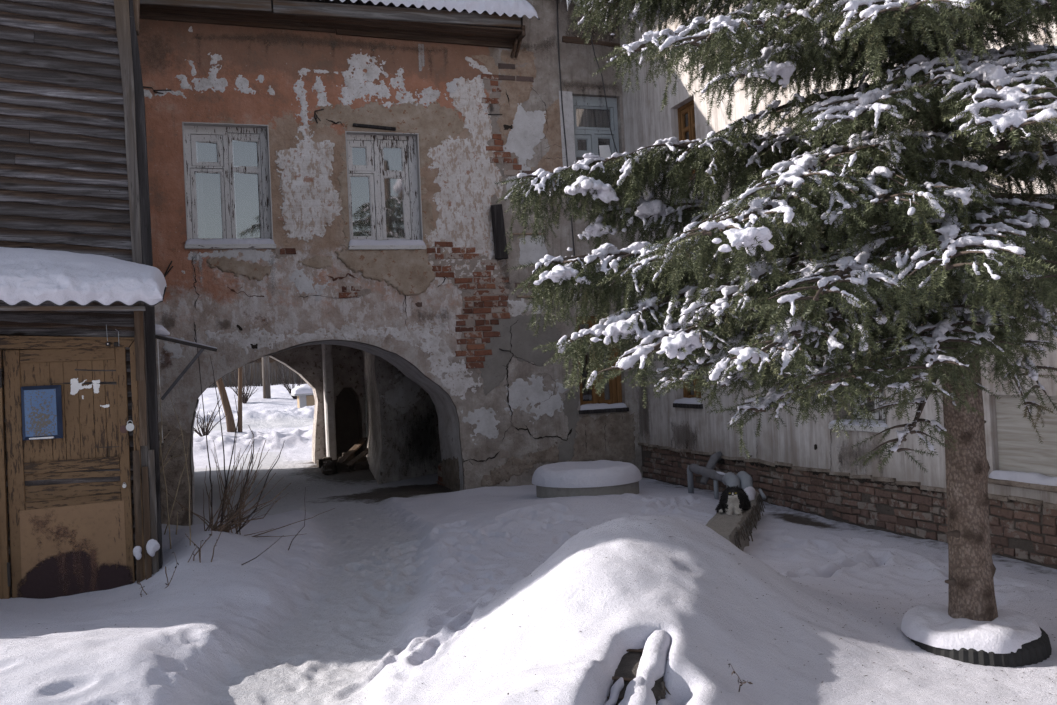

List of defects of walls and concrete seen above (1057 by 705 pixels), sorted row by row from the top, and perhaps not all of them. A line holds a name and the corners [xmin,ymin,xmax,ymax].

peeling [144,52,275,99]
peeling [181,47,568,445]
crack [301,273,358,299]
peeling [159,337,185,363]
crack [462,320,623,489]